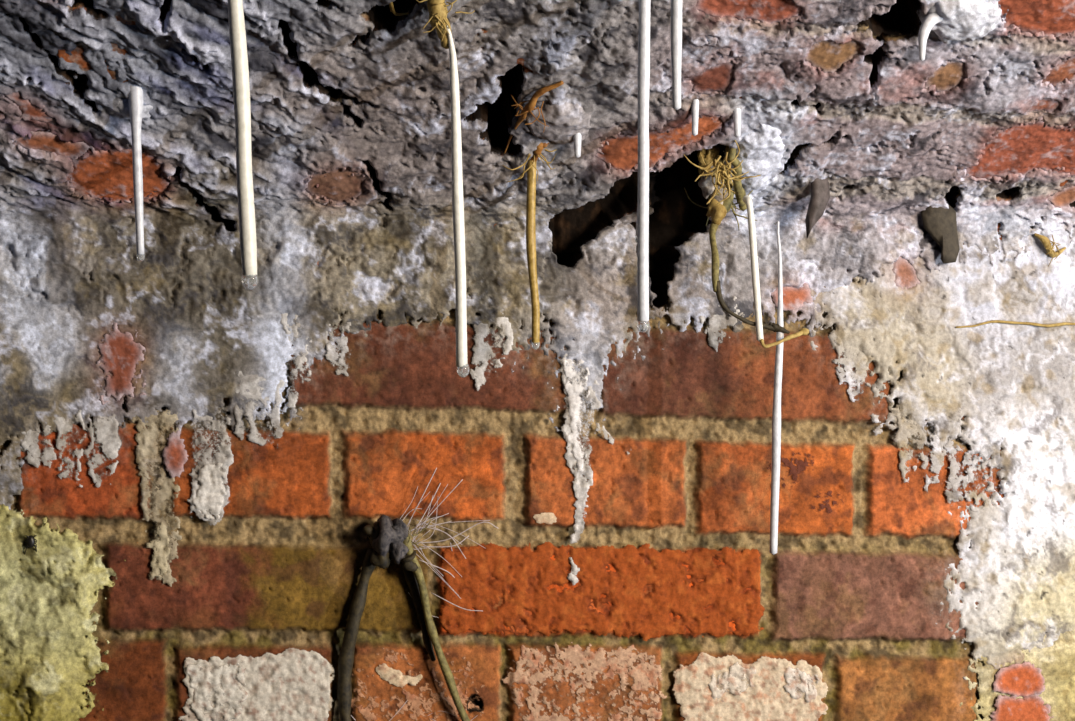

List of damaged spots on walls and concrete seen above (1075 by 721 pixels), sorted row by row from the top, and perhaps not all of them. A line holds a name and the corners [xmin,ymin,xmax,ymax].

crack [6,13,98,111]
crack [72,0,109,20]
crack [278,19,363,126]
peeling [696,0,802,23]
spalling [805,0,922,86]
peeling [998,0,1075,38]
peeling [944,56,1075,208]
crack [175,166,235,232]
crack [361,160,392,208]
leakage [0,0,651,587]
leakage [649,0,1075,671]
spalling [438,542,765,641]